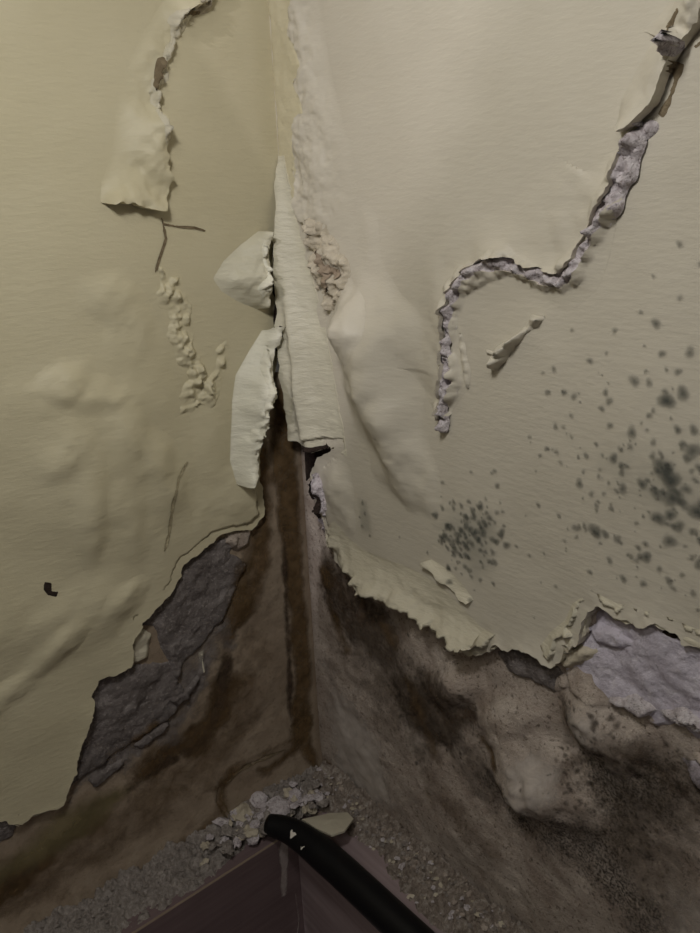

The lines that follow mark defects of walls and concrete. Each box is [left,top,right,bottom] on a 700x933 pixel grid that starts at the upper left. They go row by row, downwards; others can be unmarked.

crack [155,218,205,273]
crack [395,130,647,433]
flaking render [0,0,359,933]
leakage [136,387,388,803]
leakage [320,558,477,751]
flaking render [301,445,700,933]
leakage [480,715,700,933]